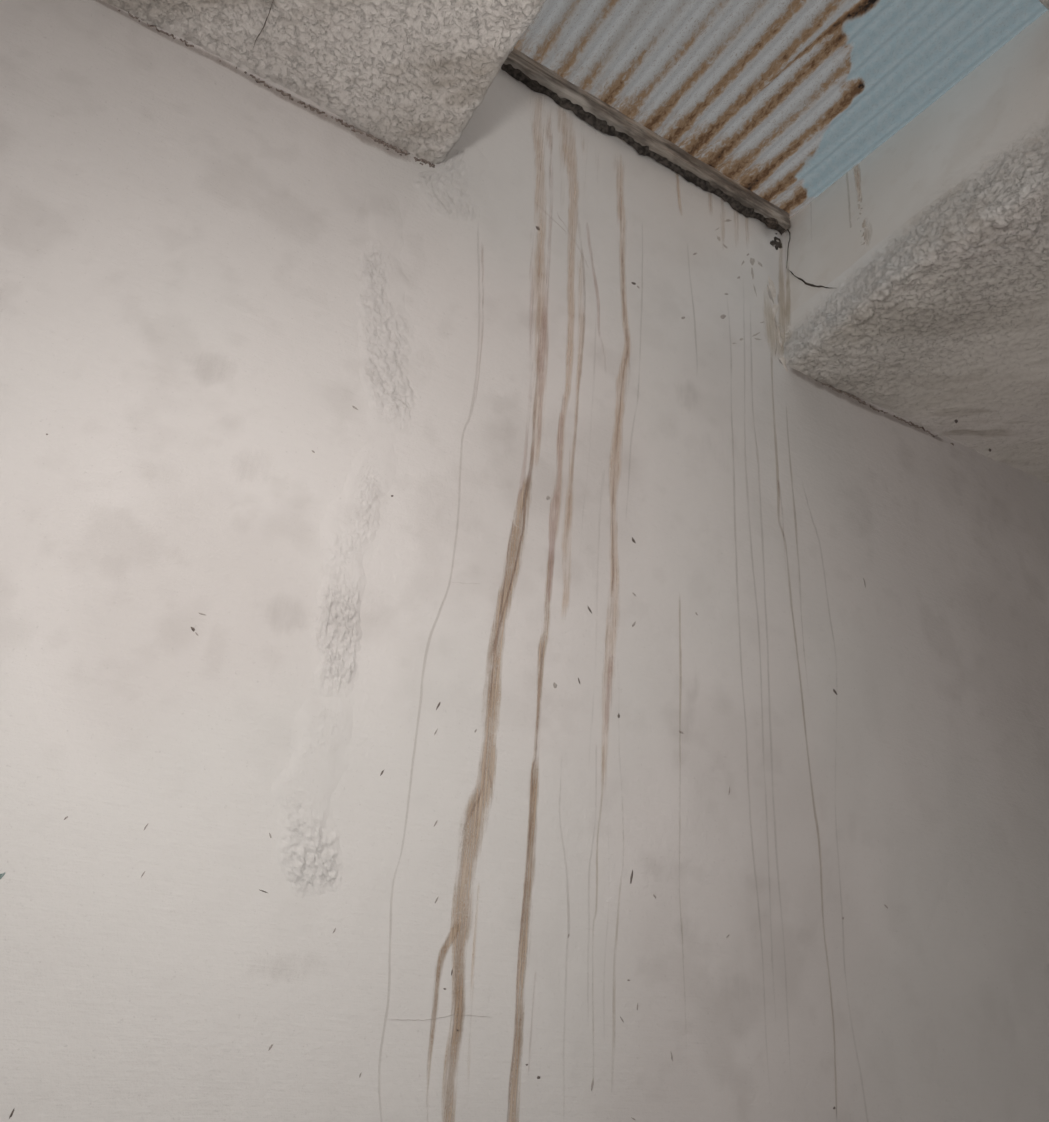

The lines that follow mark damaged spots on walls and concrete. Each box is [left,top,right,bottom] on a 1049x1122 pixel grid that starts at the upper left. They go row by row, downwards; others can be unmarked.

crack [786,229,829,288]